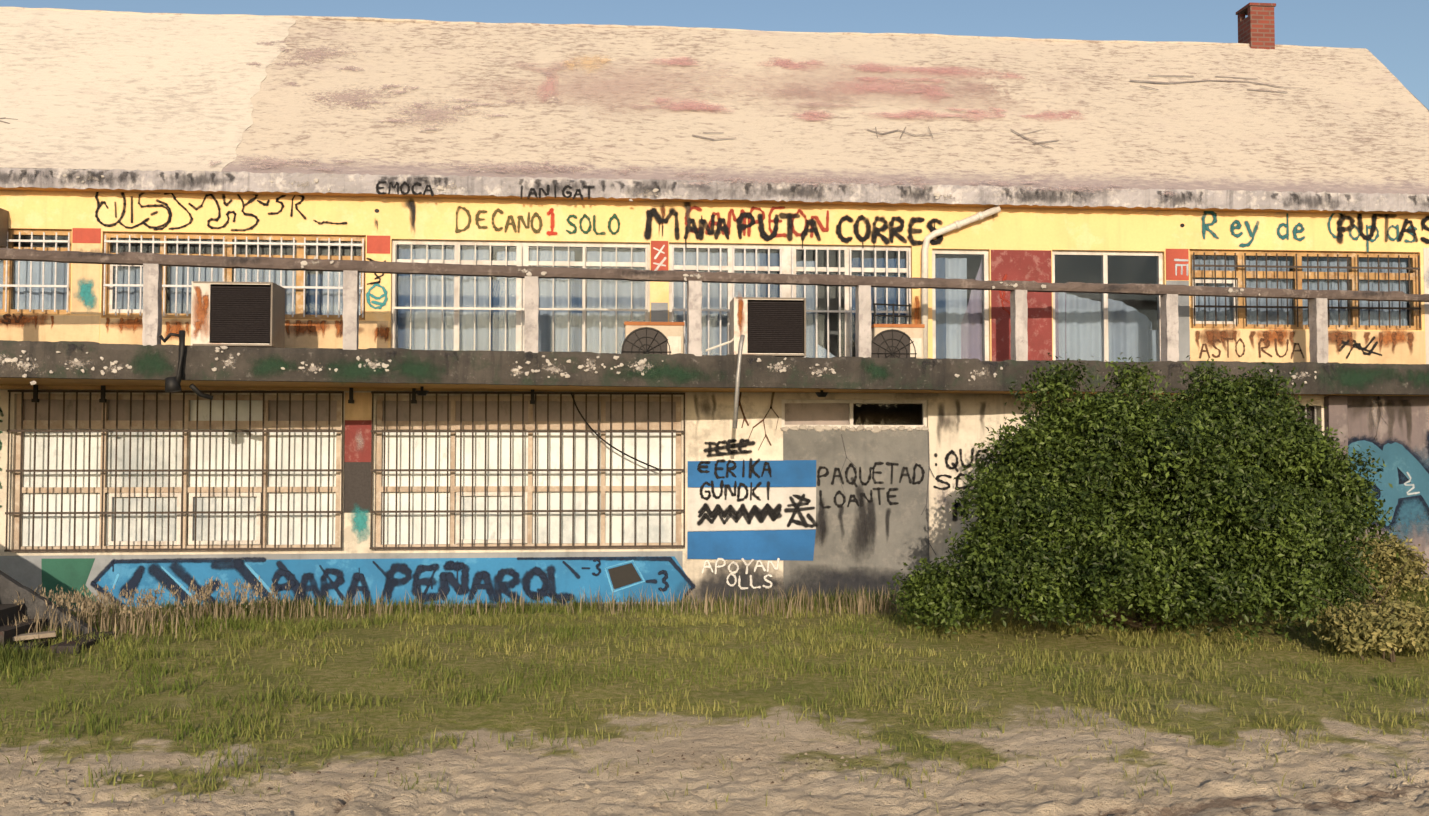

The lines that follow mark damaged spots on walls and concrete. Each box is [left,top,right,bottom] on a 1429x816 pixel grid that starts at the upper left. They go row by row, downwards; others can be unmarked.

corrosion [0,314,54,327]
corrosion [106,317,143,330]
corrosion [166,286,208,338]
damp [1354,398,1411,434]
damp [819,487,890,537]